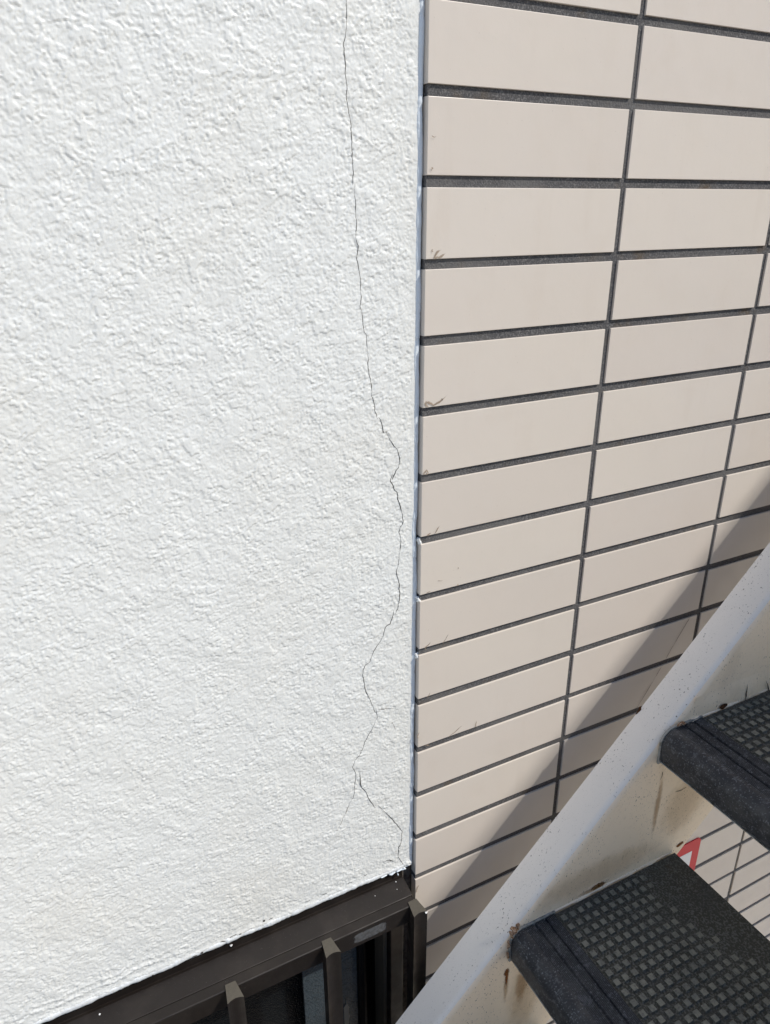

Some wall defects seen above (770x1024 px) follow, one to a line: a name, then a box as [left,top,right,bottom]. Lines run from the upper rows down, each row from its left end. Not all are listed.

crack [339,3,403,864]